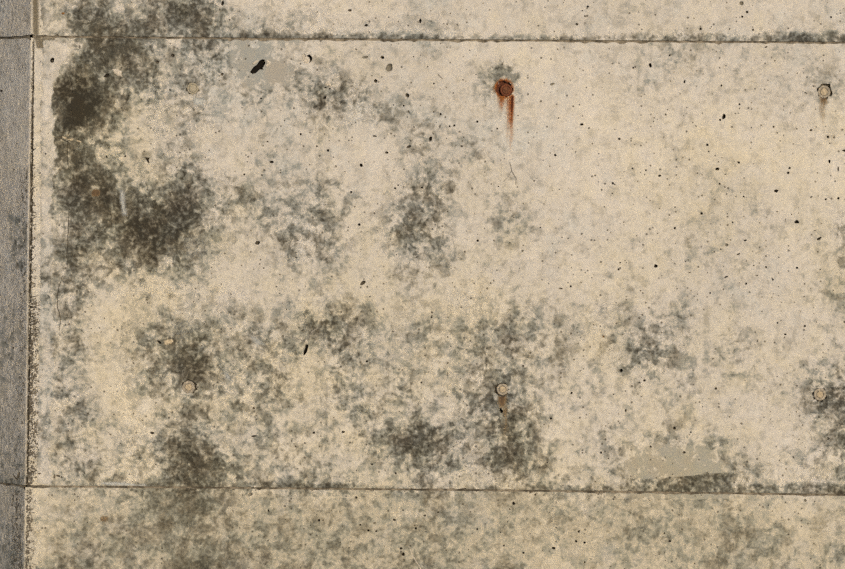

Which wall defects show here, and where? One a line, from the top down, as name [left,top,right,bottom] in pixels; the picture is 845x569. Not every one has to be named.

damp [66,0,845,42]
damp [482,56,522,96]
rust [495,79,514,127]
damp [45,38,423,489]
damp [369,159,446,267]
damp [827,212,845,283]
damp [44,266,845,569]